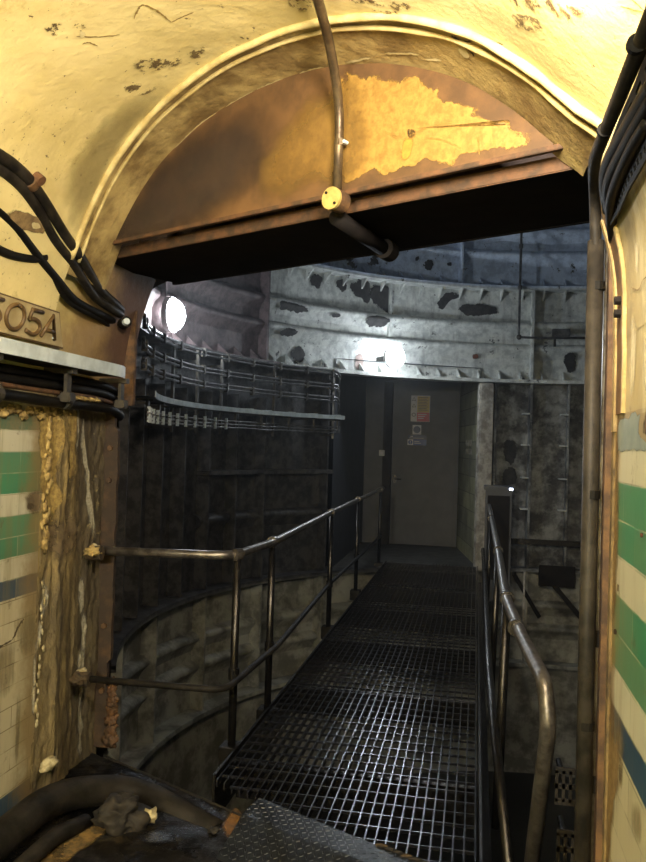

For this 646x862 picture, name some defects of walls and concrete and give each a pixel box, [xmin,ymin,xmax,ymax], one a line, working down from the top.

peeling [266,58,529,192]
peeling [310,274,322,289]
peeling [280,301,308,313]
peeling [336,279,394,327]
peeling [437,292,497,316]
peeling [280,328,298,337]
peeling [290,346,305,363]
peeling [563,353,576,373]
peeling [617,412,646,452]
crack [0,619,24,648]
spalling [34,581,47,728]
corrosion [101,676,119,749]